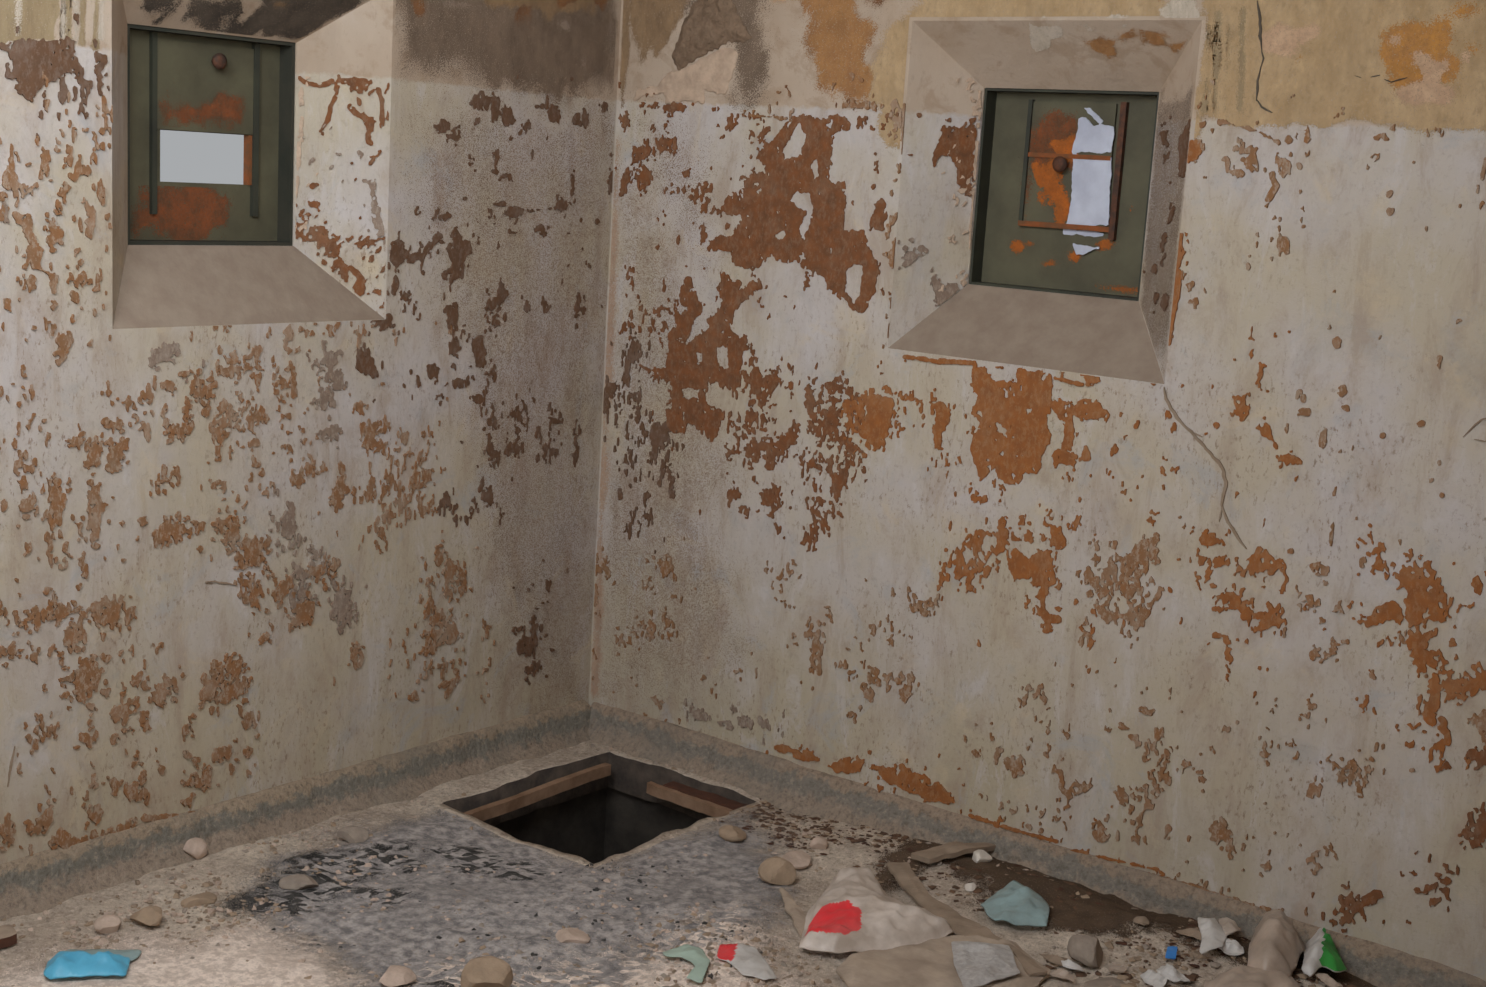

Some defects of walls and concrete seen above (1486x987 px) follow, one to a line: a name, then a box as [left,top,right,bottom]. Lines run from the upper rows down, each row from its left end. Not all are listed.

damp [0,0,106,51]
damp [725,0,780,115]
crack [1256,1,1273,113]
peeling [0,13,113,366]
peeling [0,74,600,856]
peeling [433,48,1486,773]
crack [1163,387,1247,549]
spalling [464,763,748,864]
peeling [630,657,1239,877]
peeling [1208,816,1385,937]
peeling [1289,742,1385,799]
peeling [1400,802,1486,912]